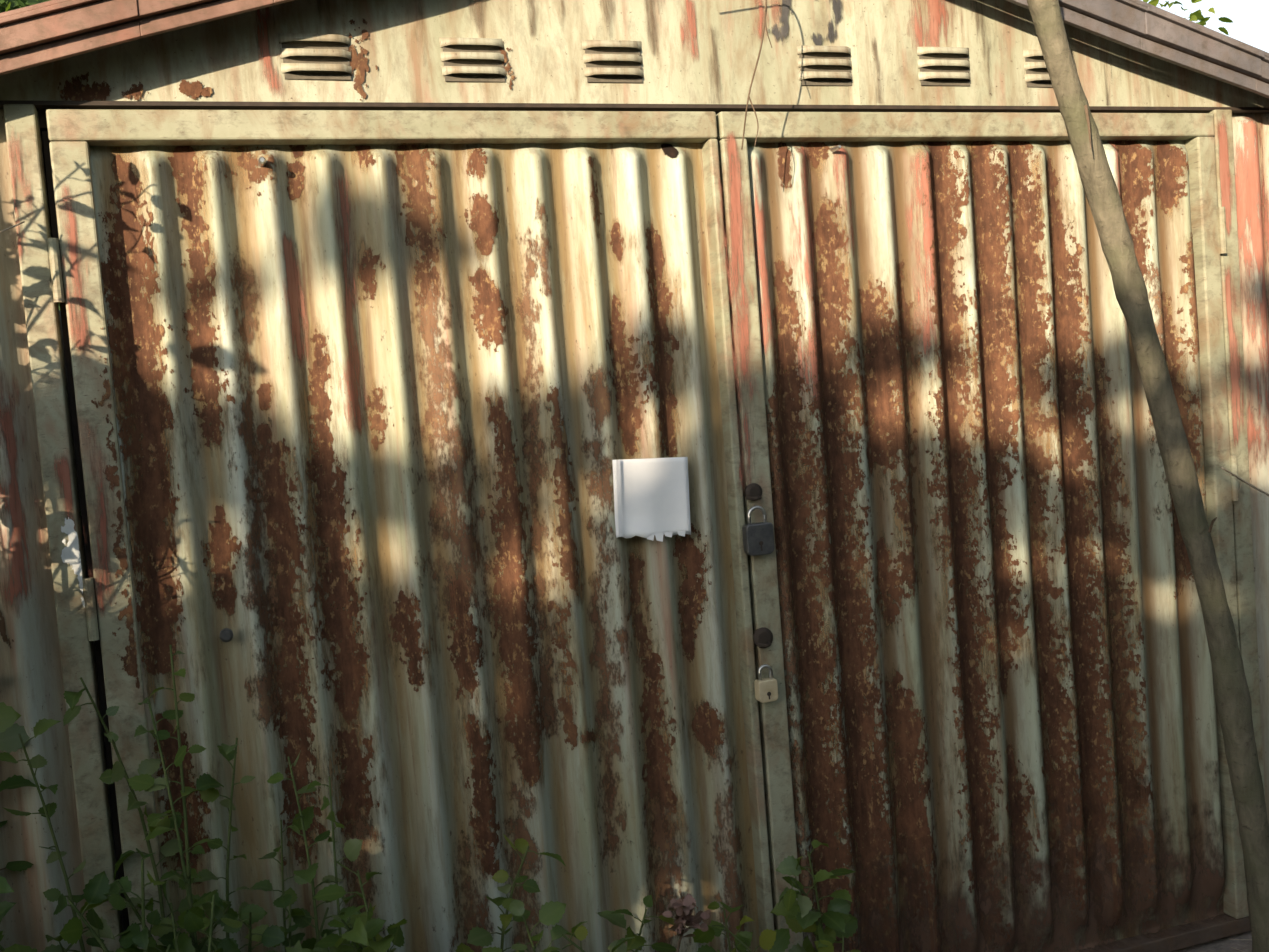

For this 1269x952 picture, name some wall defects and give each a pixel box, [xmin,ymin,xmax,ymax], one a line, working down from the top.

corrosion [58,71,149,101]
corrosion [179,79,212,99]
corrosion [348,18,378,101]
corrosion [499,42,515,90]
peeling [8,140,30,259]
peeling [63,187,90,349]
peeling [1218,117,1269,462]
peeling [0,380,41,607]
peeling [54,457,111,612]
corrosion [91,143,752,952]
corrosion [766,140,1225,952]